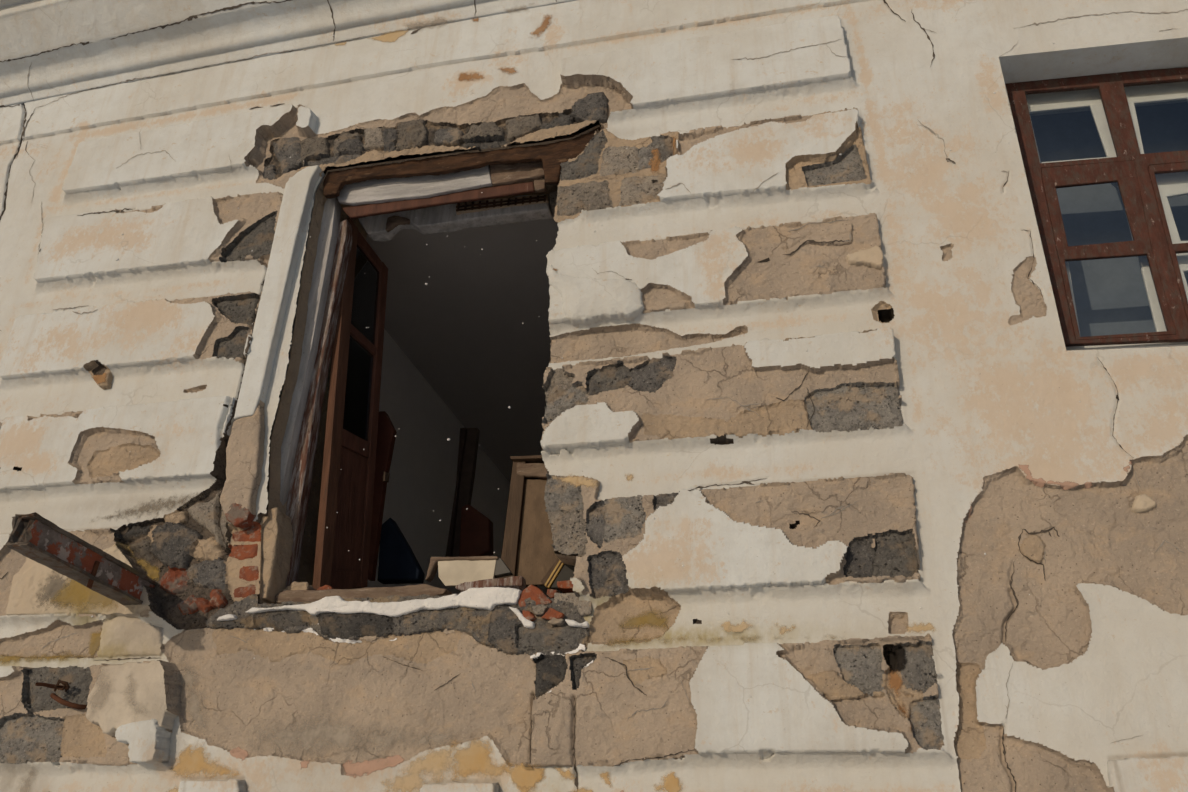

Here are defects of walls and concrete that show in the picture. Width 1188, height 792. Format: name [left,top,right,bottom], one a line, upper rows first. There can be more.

crack [883,0,936,67]
crack [0,0,364,252]
spalling [208,74,872,268]
crack [53,305,98,314]
spalling [165,291,262,364]
spalling [541,283,903,451]
peeling [723,213,886,305]
crack [1099,360,1140,486]
spalling [699,473,921,585]
peeling [0,473,708,776]
peeling [776,434,1188,792]
corrosion [50,693,87,710]